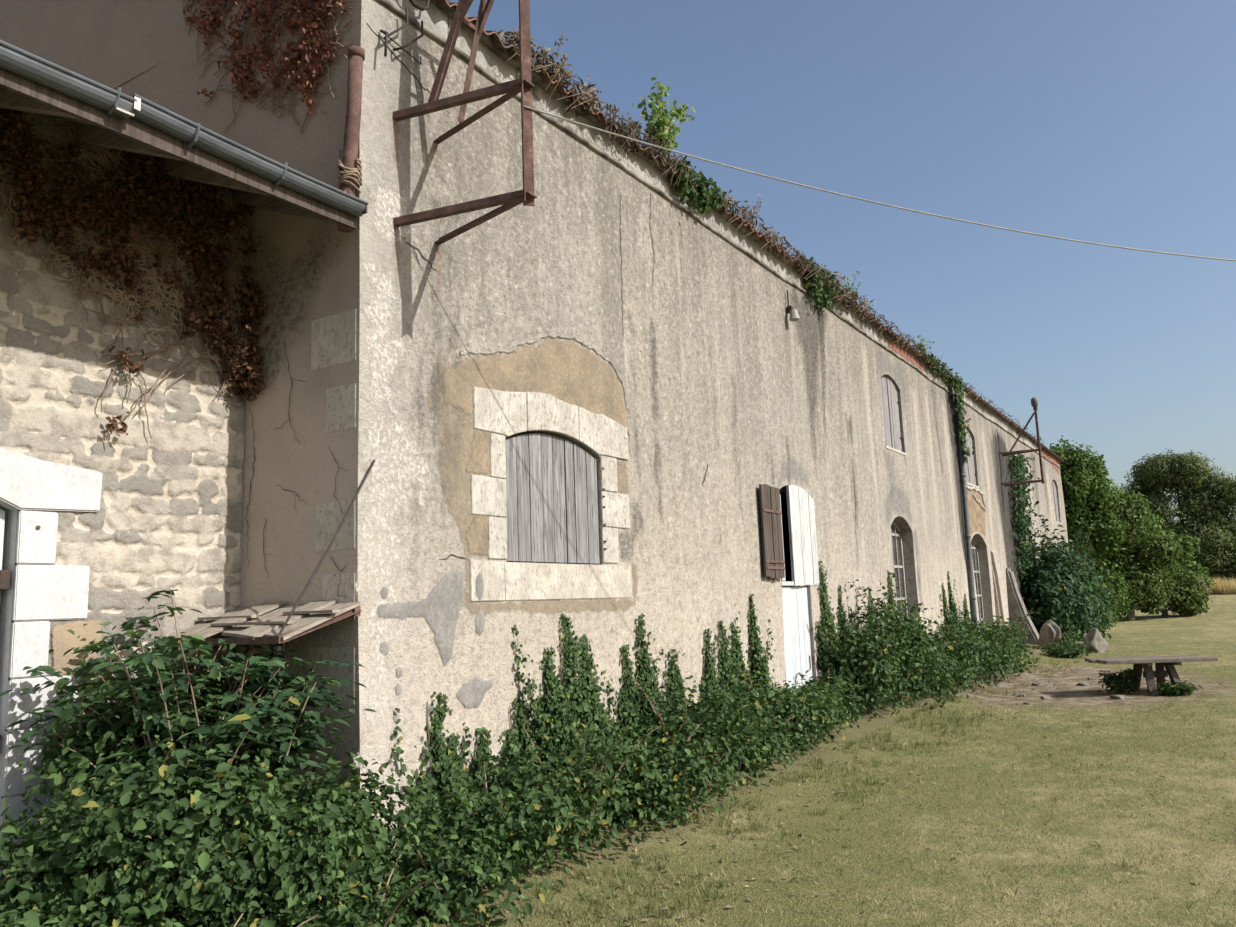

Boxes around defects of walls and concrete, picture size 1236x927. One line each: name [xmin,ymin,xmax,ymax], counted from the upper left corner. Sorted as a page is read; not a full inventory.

crack [246,342,348,572]
peeling [428,334,643,614]
water stain [792,289,825,445]
water stain [863,351,968,600]